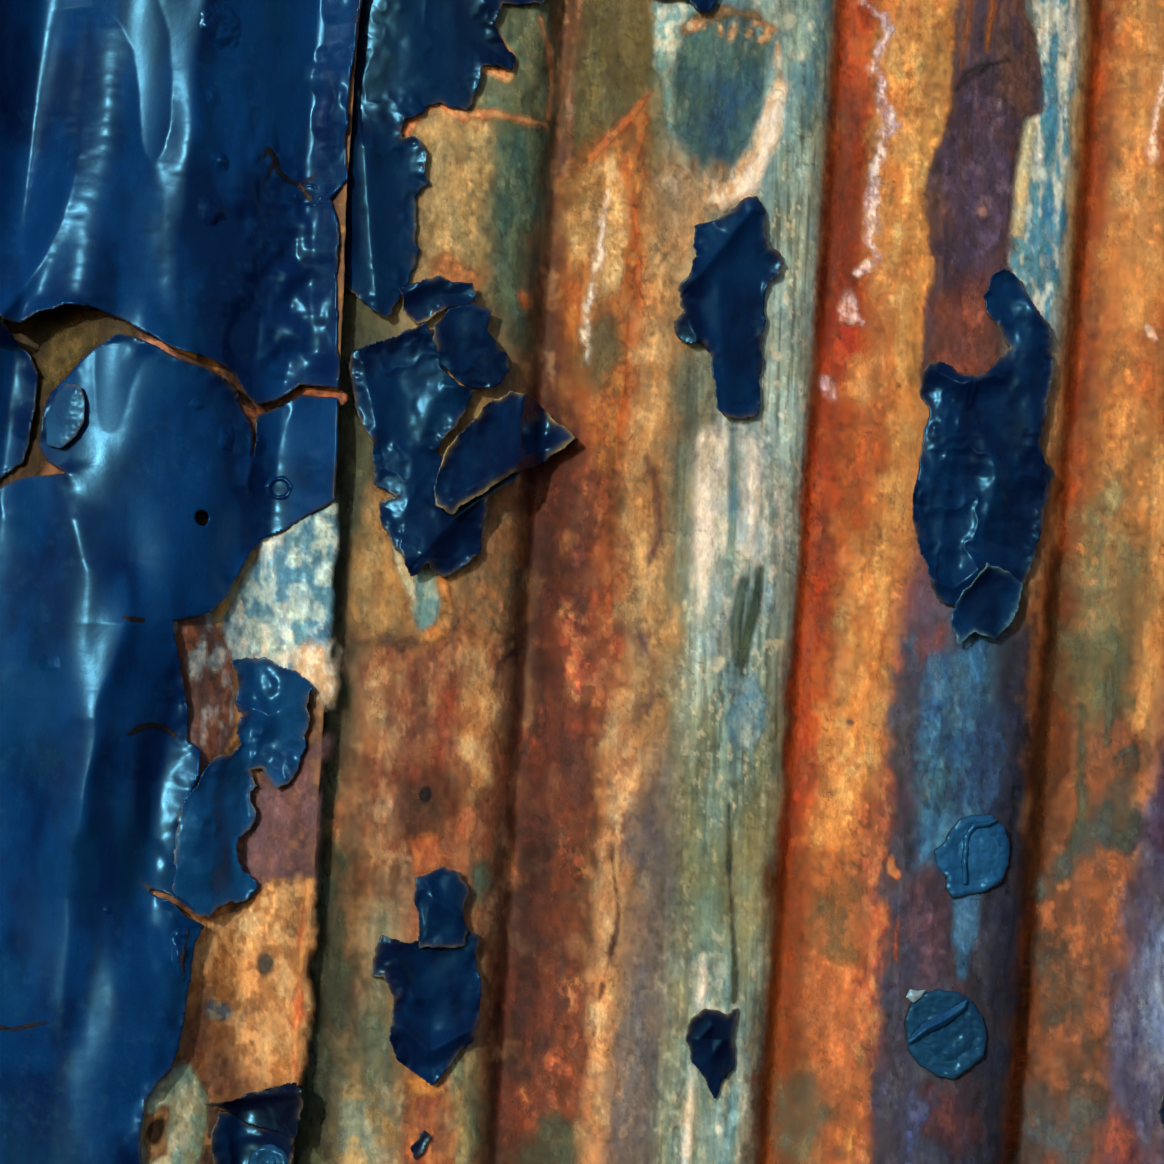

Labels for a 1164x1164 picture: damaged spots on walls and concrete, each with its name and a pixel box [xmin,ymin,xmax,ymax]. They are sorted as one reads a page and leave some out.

corrosion [482,36,514,82]
peeling [45,384,85,448]
peeling [172,498,338,918]
peeling [344,0,575,577]
corrosion [352,96,693,1164]
peeling [673,196,784,419]
corrosion [752,0,953,1164]
peeling [912,268,1055,644]
corrosion [1000,0,1164,1164]
peeling [140,1064,303,1164]
peeling [371,866,481,1086]
peeling [686,1008,738,1098]